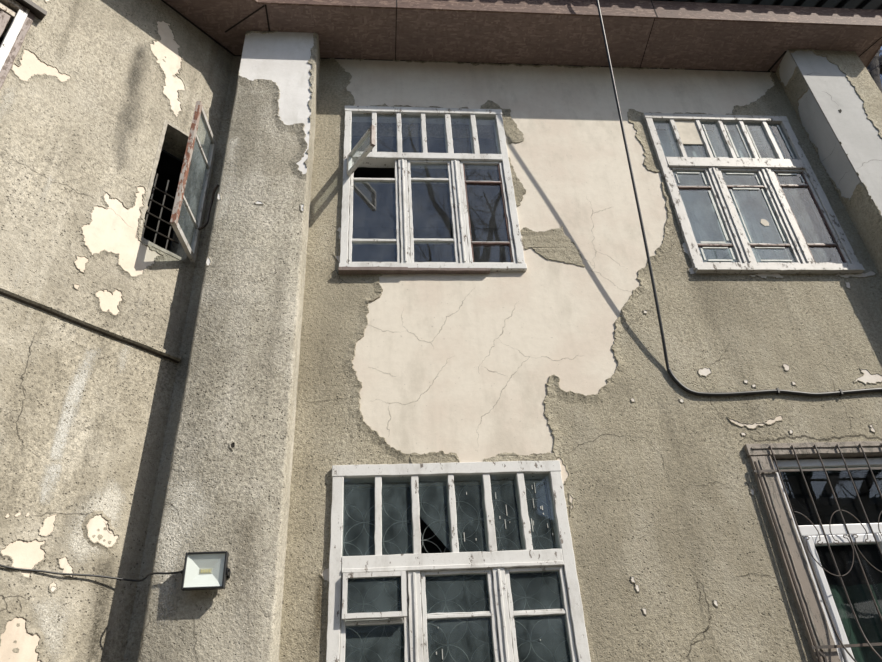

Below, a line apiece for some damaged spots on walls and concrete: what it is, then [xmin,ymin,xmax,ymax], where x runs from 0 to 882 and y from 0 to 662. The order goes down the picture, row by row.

peeling [9,45,75,86]
peeling [147,18,188,120]
peeling [72,183,165,320]
peeling [238,30,882,516]
peeling [0,512,75,597]
peeling [81,510,122,553]
peeling [0,610,49,662]
crack [687,571,711,660]